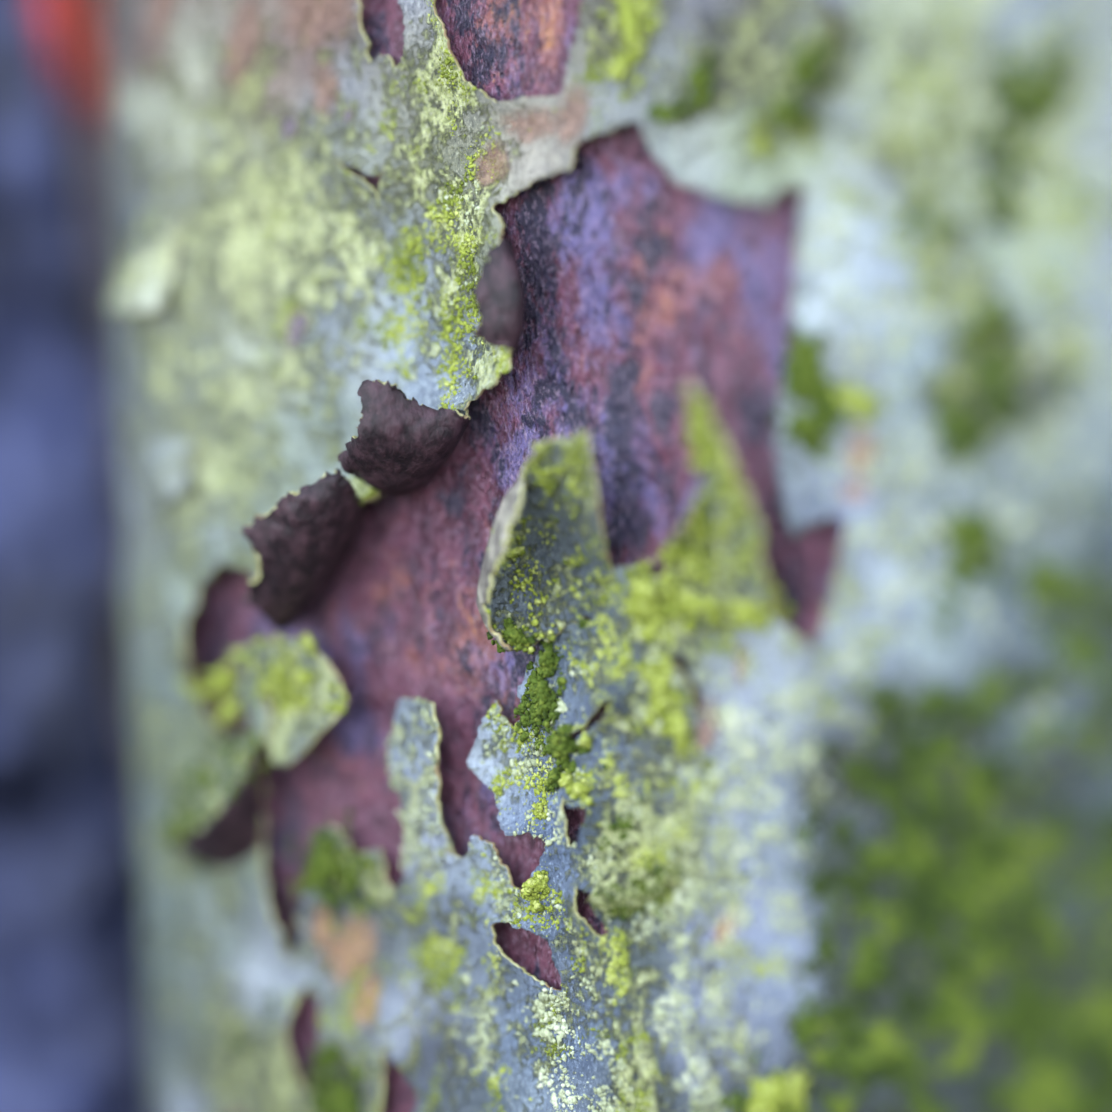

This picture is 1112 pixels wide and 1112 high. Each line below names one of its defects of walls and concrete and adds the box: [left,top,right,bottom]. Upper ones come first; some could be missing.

peeling [436,0,583,102]
peeling [157,122,845,955]
peeling [494,922,562,990]